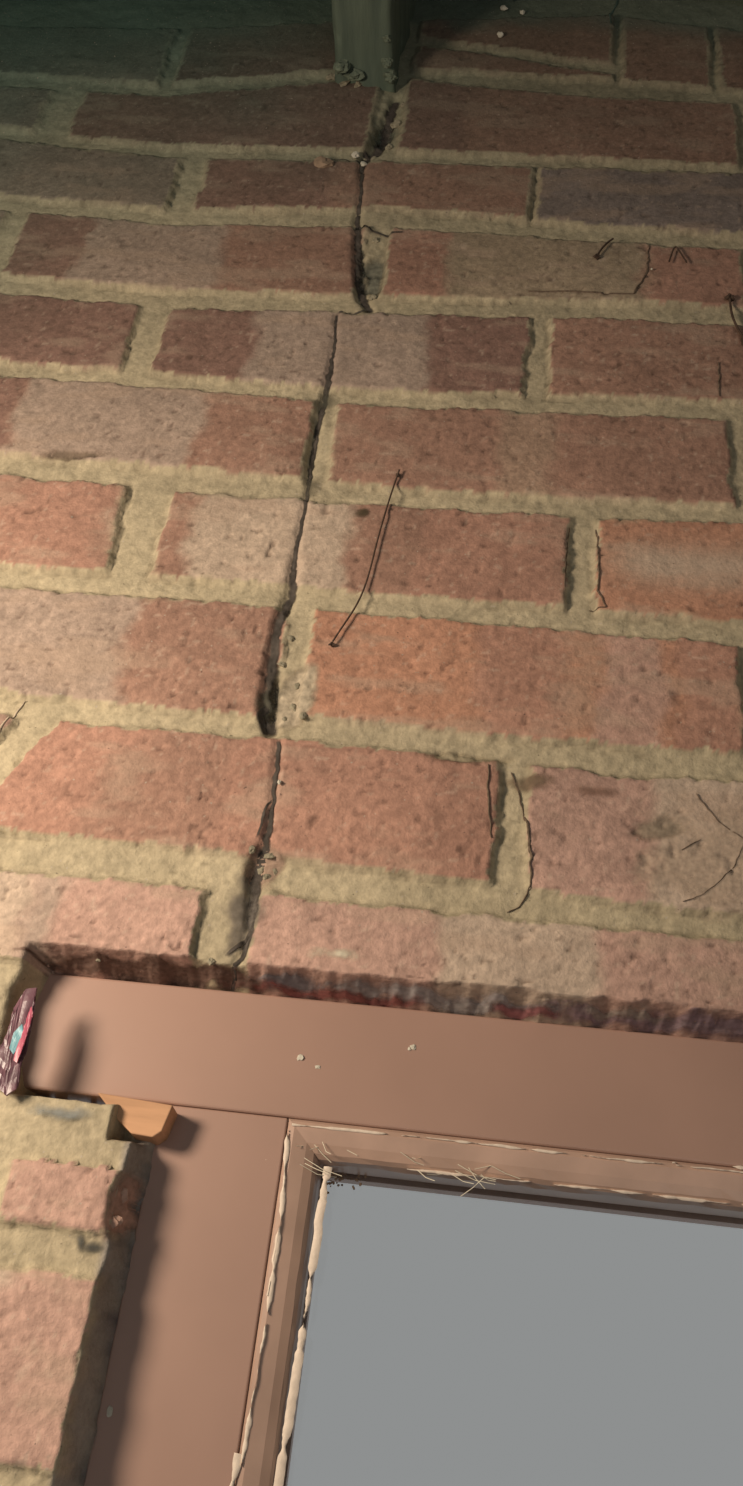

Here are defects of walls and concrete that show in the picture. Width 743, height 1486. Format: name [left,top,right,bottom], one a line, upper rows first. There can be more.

crack [227,103,402,992]